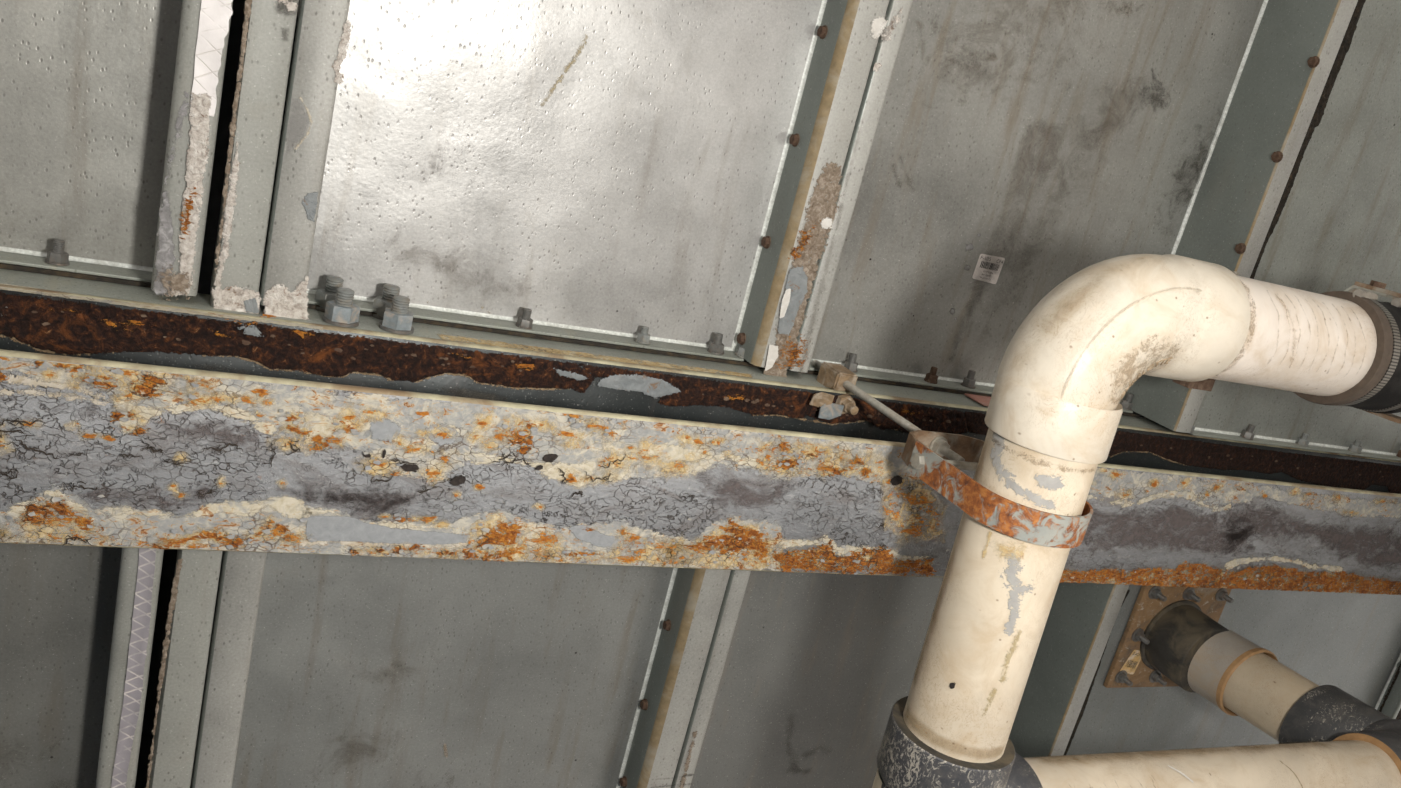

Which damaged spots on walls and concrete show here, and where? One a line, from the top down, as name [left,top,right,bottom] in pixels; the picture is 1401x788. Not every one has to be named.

peeling [302,192,318,222]
corrosion [763,162,843,377]
corrosion [0,494,117,543]
corrosion [35,360,385,451]
corrosion [136,517,317,551]
peeling [0,483,784,571]
peeling [0,334,921,489]
corrosion [356,411,731,484]
corrosion [350,442,950,577]
corrosion [1091,468,1159,498]
peeling [1089,451,1401,519]
corrosion [1059,555,1401,595]